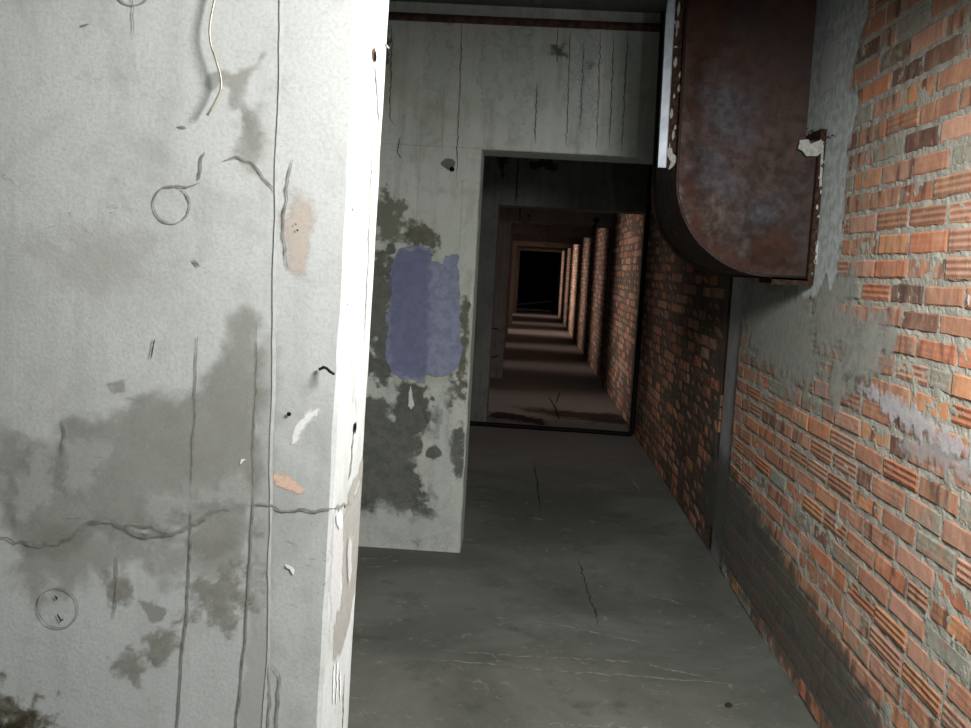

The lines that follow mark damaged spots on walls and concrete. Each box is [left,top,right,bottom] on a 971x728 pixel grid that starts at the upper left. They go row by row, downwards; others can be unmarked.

leakage [207,71,259,160]
leakage [0,310,261,600]
leakage [333,188,471,659]
crack [0,502,348,547]
leakage [0,694,54,728]